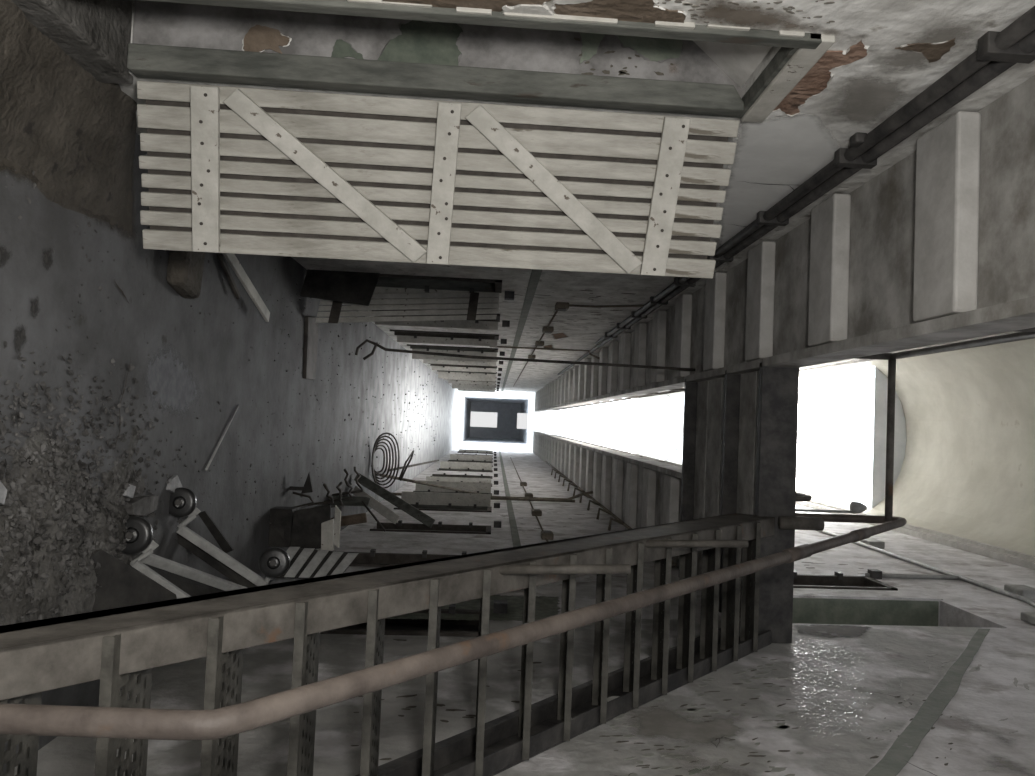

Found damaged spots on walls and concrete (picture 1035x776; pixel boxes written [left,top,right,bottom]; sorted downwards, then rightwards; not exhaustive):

peeling [753,0,835,27]
peeling [331,39,363,59]
peeling [378,20,464,66]
peeling [574,32,683,75]
flaking render [895,39,955,63]
flaking render [772,40,870,116]
peeling [650,657,799,730]
water stain [791,625,872,737]
peeling [599,714,795,776]